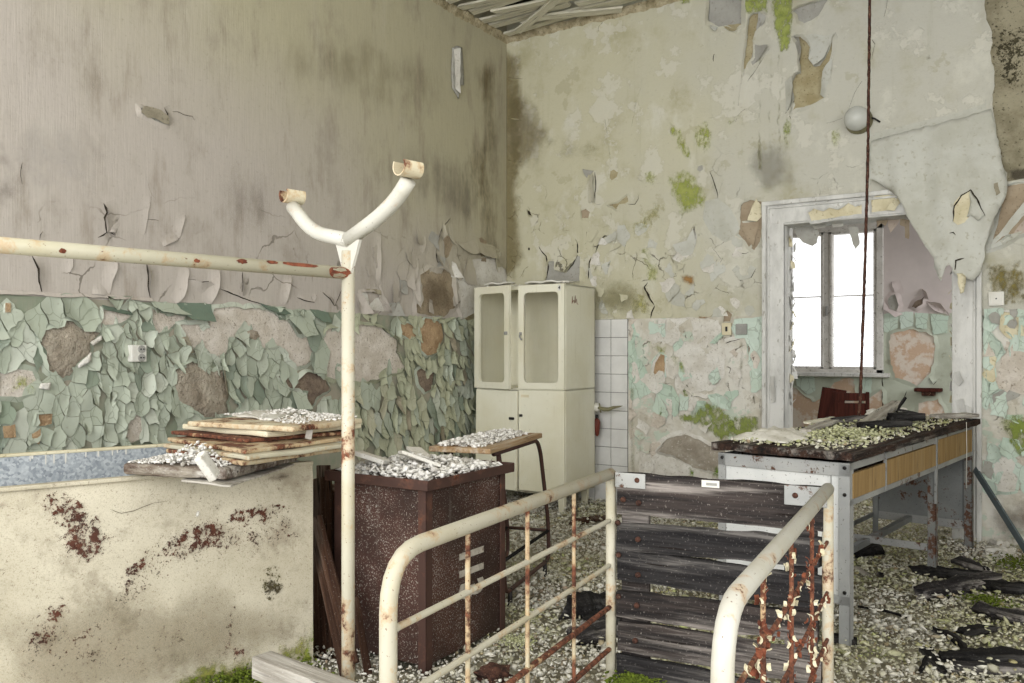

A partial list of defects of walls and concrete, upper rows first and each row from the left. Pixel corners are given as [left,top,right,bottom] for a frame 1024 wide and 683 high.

peeling [785,0,838,116]
water stain [992,25,1024,89]
water stain [506,58,536,273]
flaking render [0,290,341,454]
crack [32,193,341,309]
crack [372,231,403,318]
peeling [355,218,508,461]
peeling [543,167,775,479]
peeling [789,109,1024,495]
rust [37,491,114,563]
rust [116,504,298,604]
rust [17,596,128,670]